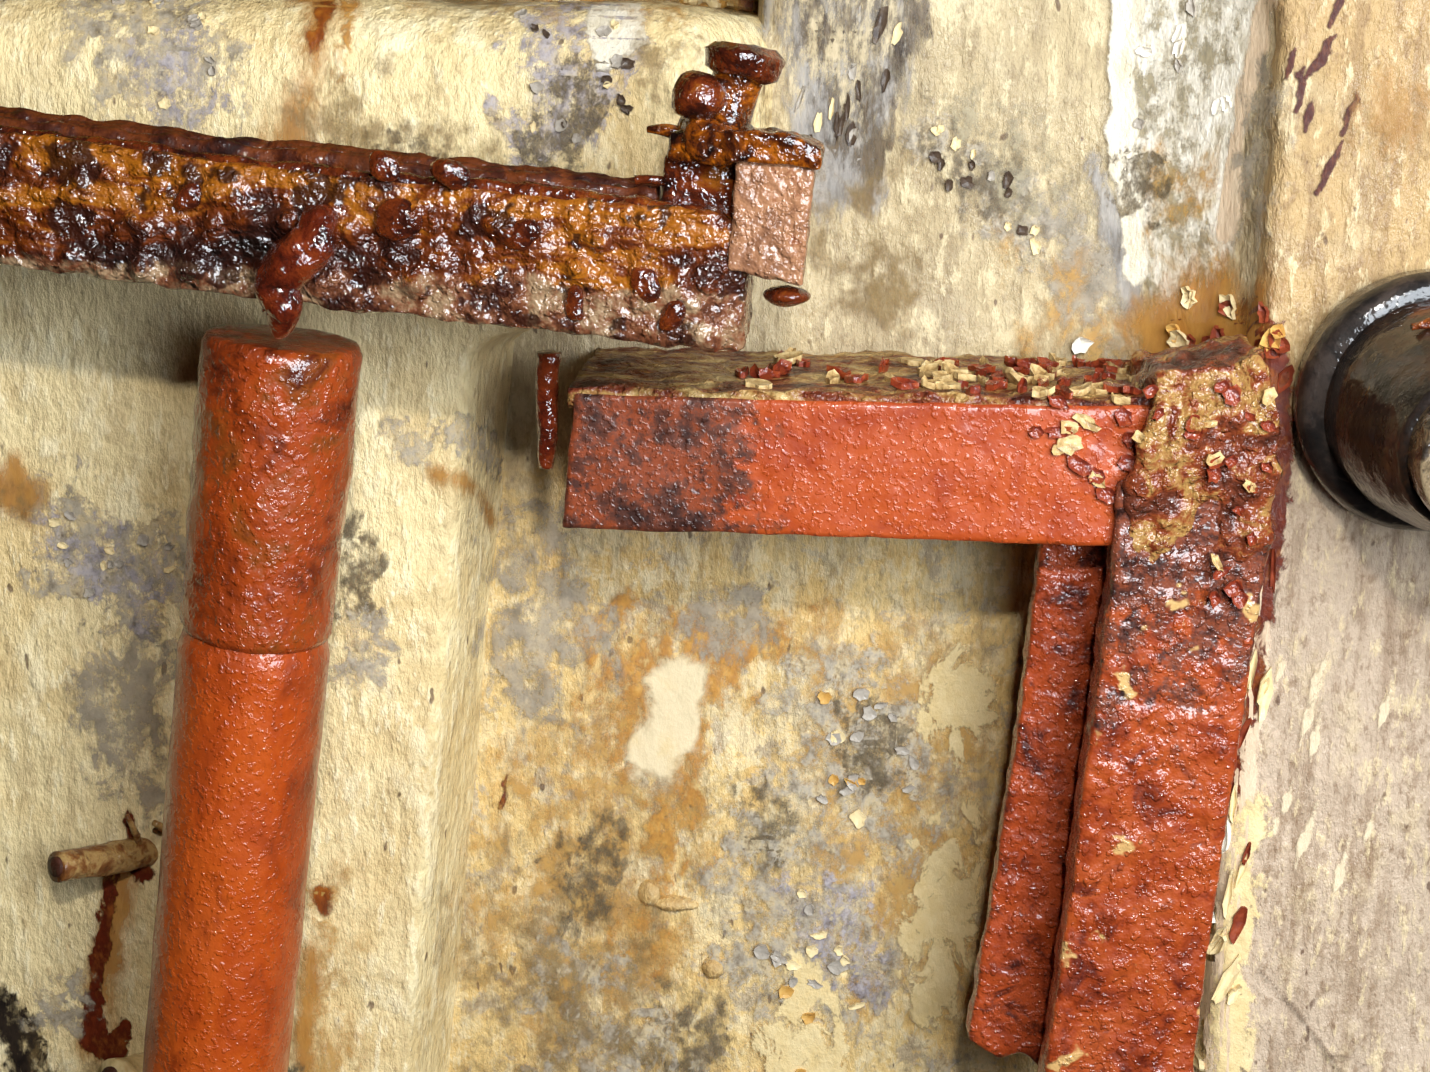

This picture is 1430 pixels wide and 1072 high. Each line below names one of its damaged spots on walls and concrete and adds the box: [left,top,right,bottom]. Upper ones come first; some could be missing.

rust [274,85,311,141]
rust [296,0,359,82]
rust [0,457,39,514]
peeling [744,378,772,389]
rust [735,336,1165,504]
rust [1124,271,1295,393]
peeling [376,412,620,737]
peeling [1193,344,1295,1072]
peeling [513,585,999,1072]
leakage [0,968,100,1072]
rust [78,866,155,1061]
leakage [501,811,633,1071]